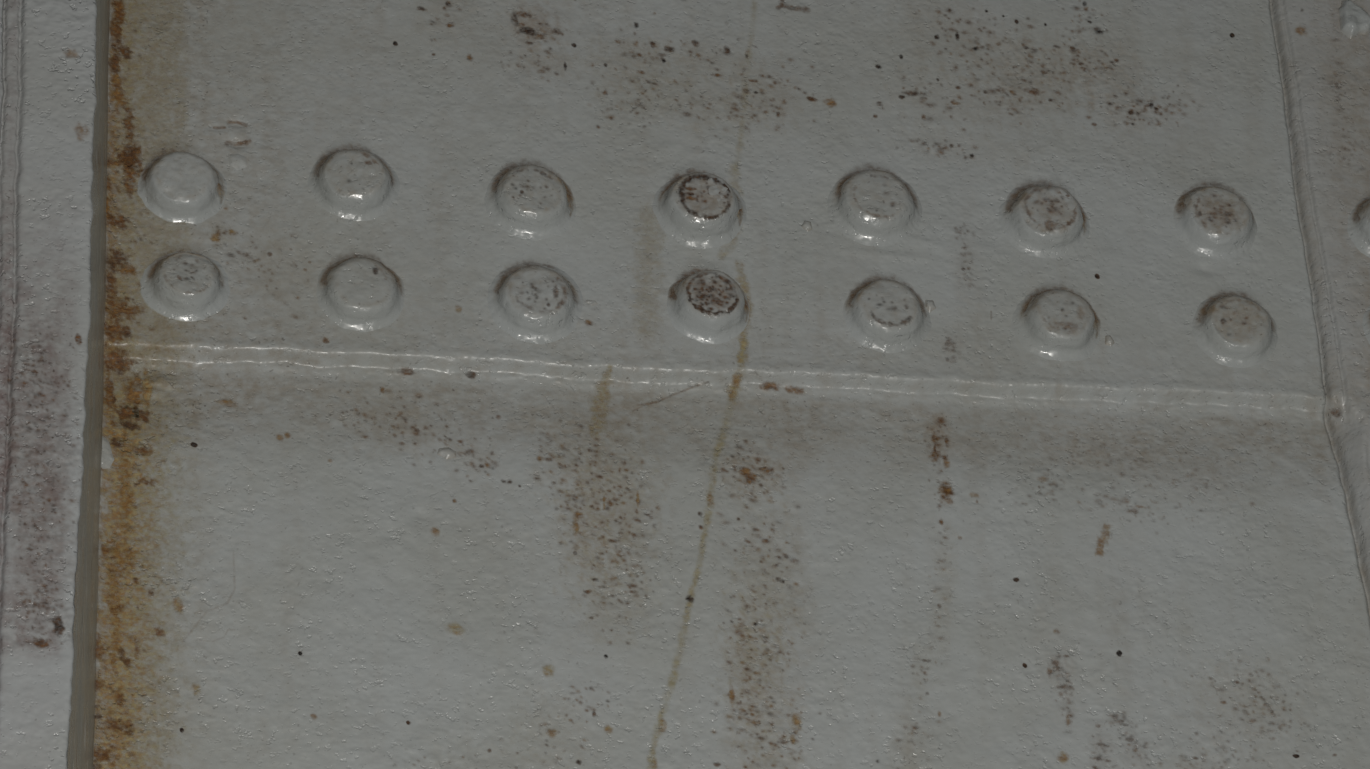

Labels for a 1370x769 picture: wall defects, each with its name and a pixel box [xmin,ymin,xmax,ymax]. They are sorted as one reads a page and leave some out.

corrosion [679,174,731,219]
corrosion [686,275,746,315]
corrosion [93,1,162,769]